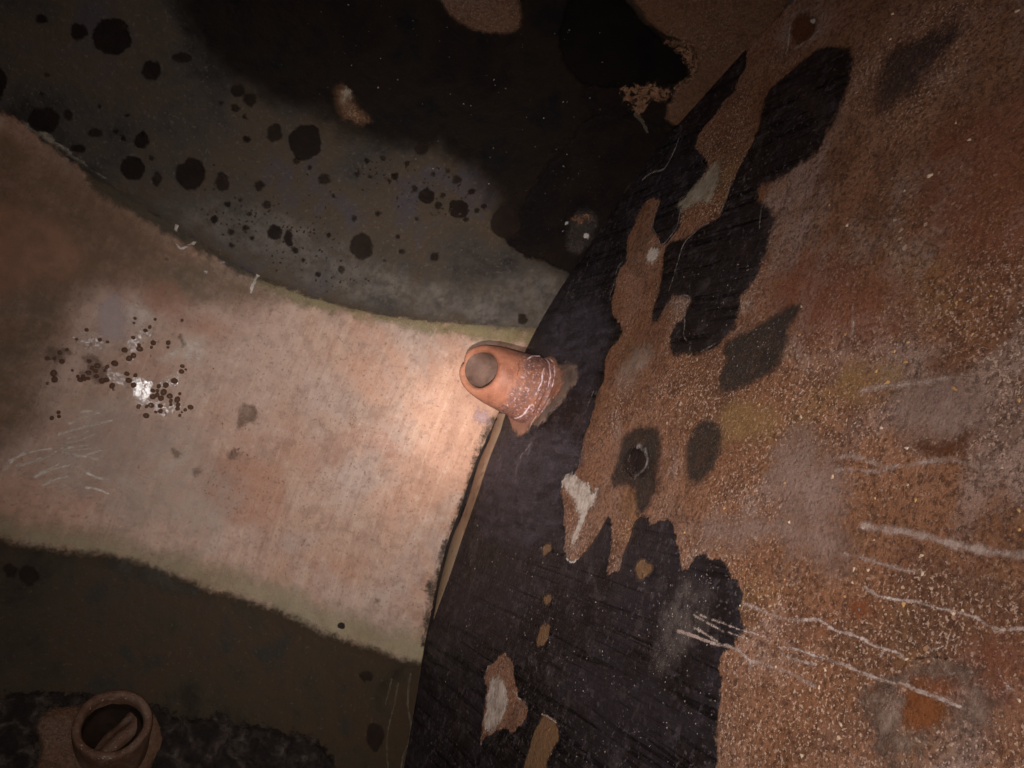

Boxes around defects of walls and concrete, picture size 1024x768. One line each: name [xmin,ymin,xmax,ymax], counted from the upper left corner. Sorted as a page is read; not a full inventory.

flaking render [619,0,788,129]
flaking render [565,211,597,253]
damp [0,0,605,768]
rust [508,356,564,436]
flaking render [635,559,653,580]
flaking render [536,624,550,647]
flaking render [480,652,559,768]
rust [901,688,945,728]